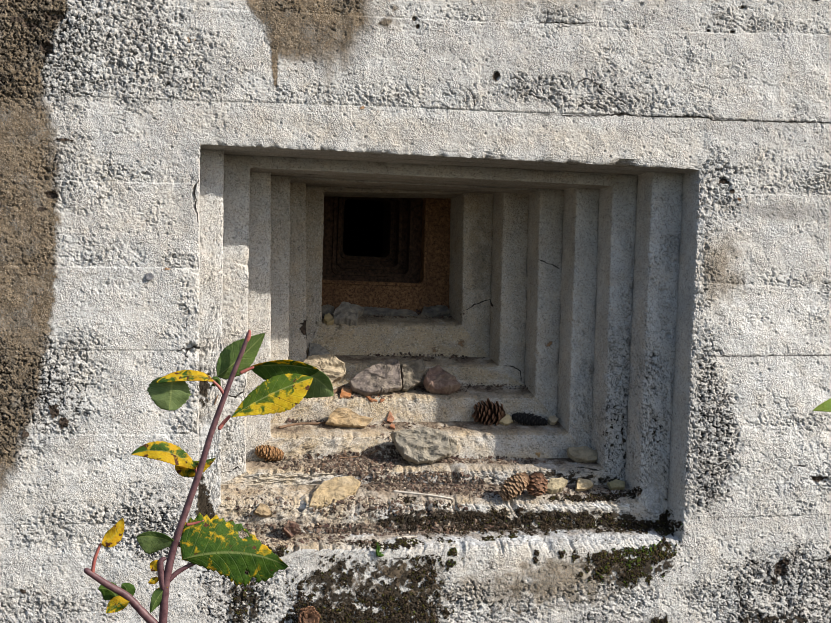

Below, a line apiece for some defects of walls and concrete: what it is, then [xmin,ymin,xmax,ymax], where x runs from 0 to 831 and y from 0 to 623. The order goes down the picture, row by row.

damp [246,0,368,86]
crack [511,77,829,123]
damp [0,0,68,486]
damp [527,399,627,485]
damp [286,414,681,623]